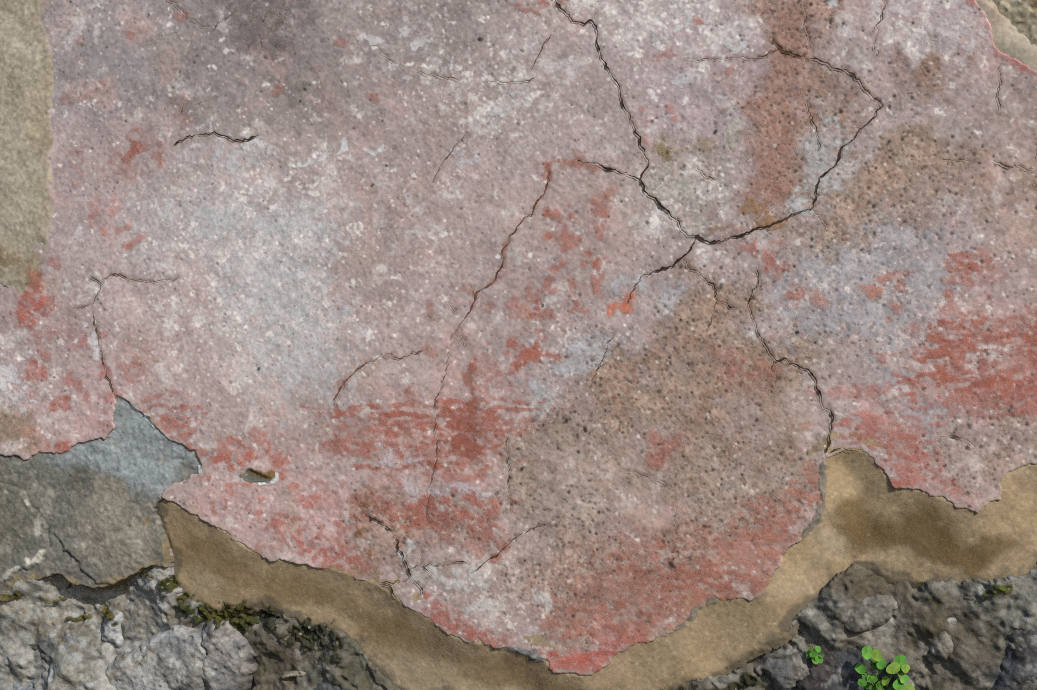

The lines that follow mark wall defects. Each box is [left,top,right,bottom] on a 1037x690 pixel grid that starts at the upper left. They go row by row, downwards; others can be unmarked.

crack [174,108,258,145]
flaking render [919,54,939,98]
crack [491,0,884,456]
crack [70,273,178,396]
crack [334,350,423,405]
crack [426,171,550,520]
flaking render [240,470,272,482]
flaking render [350,486,496,571]
crack [362,438,552,598]
flaking render [501,280,828,645]